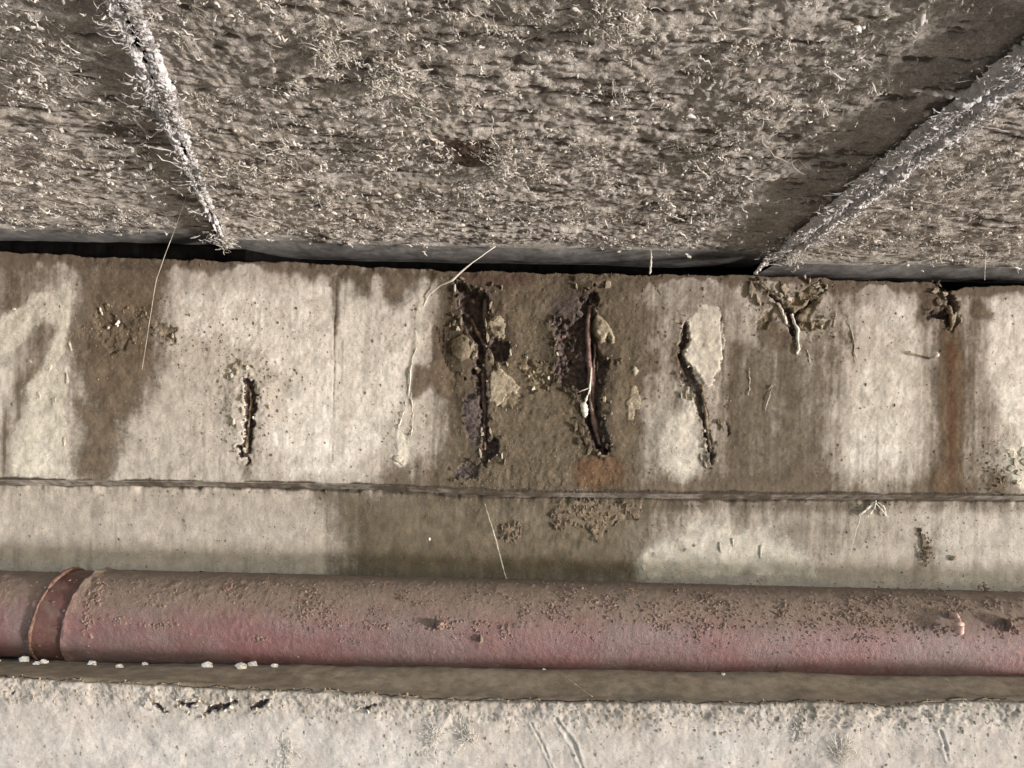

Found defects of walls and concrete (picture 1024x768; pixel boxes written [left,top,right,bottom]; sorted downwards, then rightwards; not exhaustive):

damp [0,258,1024,582]
spalling [448,276,623,485]
spalling [748,274,830,354]
spalling [926,280,962,331]
rust [931,320,969,496]